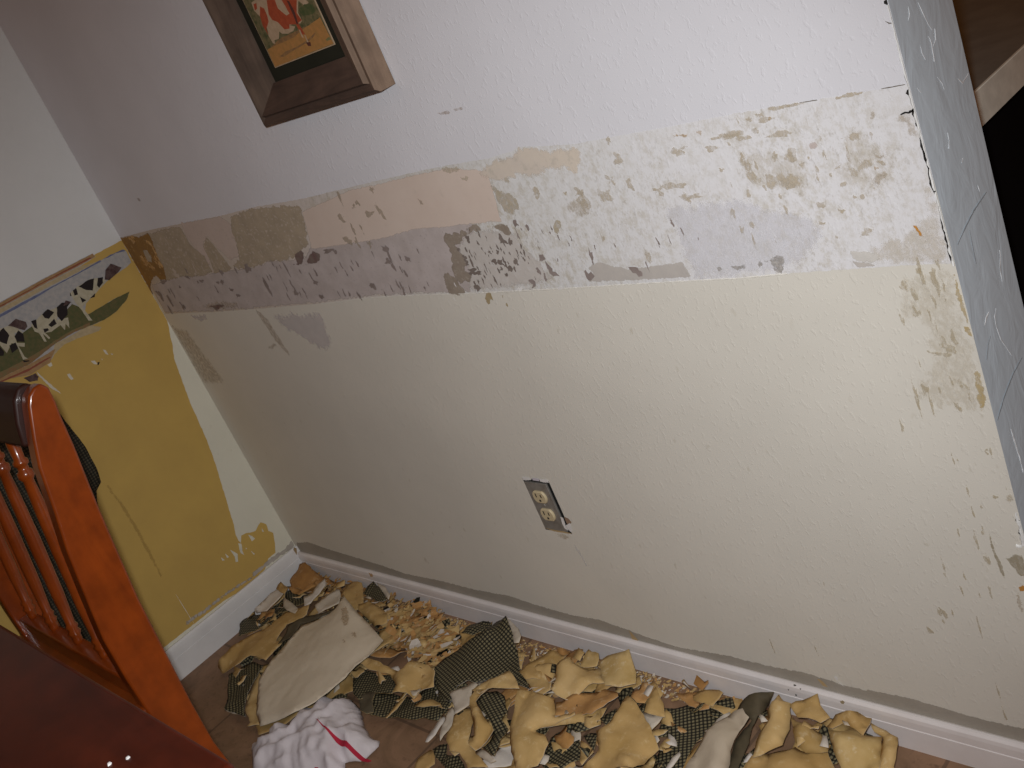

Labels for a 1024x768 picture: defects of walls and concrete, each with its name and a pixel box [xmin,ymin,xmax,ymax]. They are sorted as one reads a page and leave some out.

peeling [122,84,952,314]
water stain [874,220,972,357]
water stain [974,371,986,408]